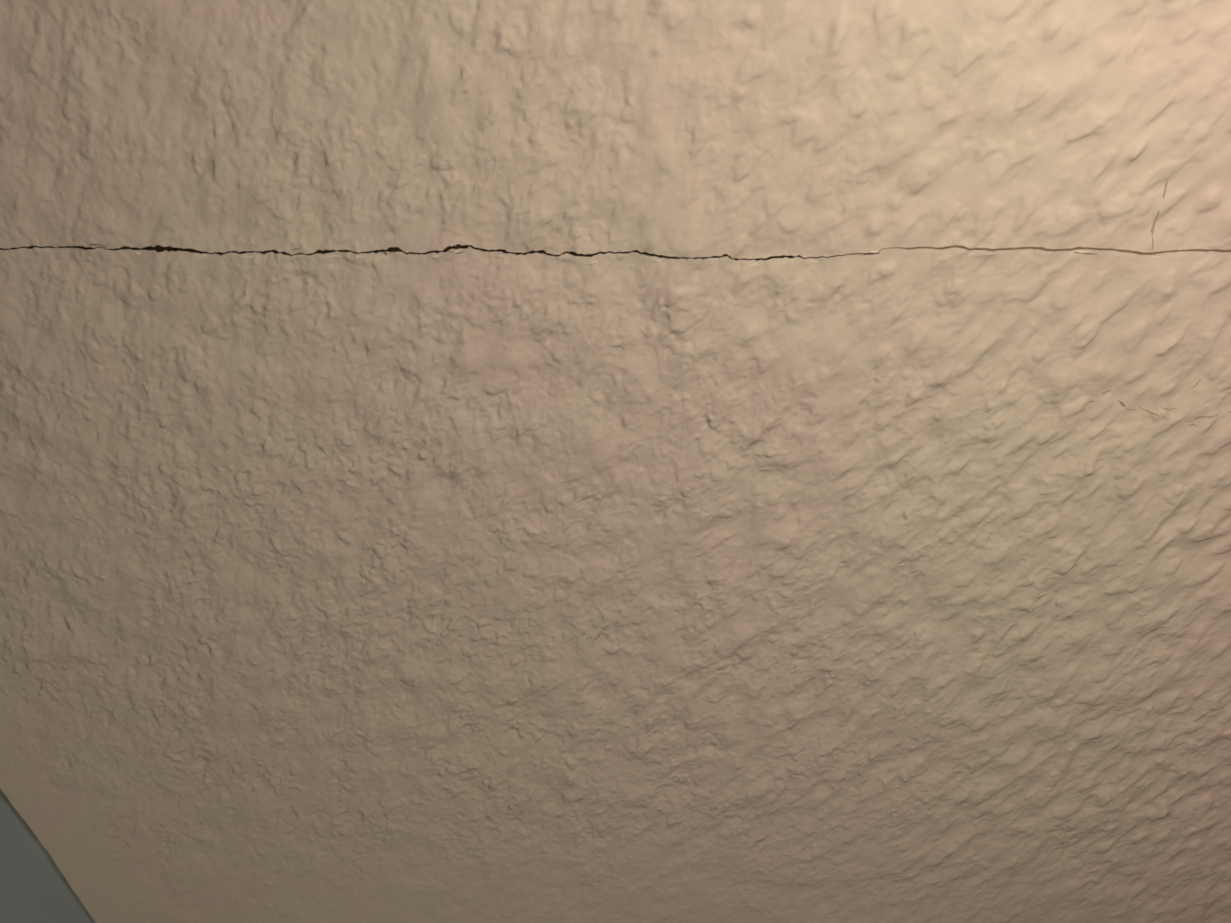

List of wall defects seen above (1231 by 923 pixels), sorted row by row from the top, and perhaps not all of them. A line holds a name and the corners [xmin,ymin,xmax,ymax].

crack [0,179,1231,266]